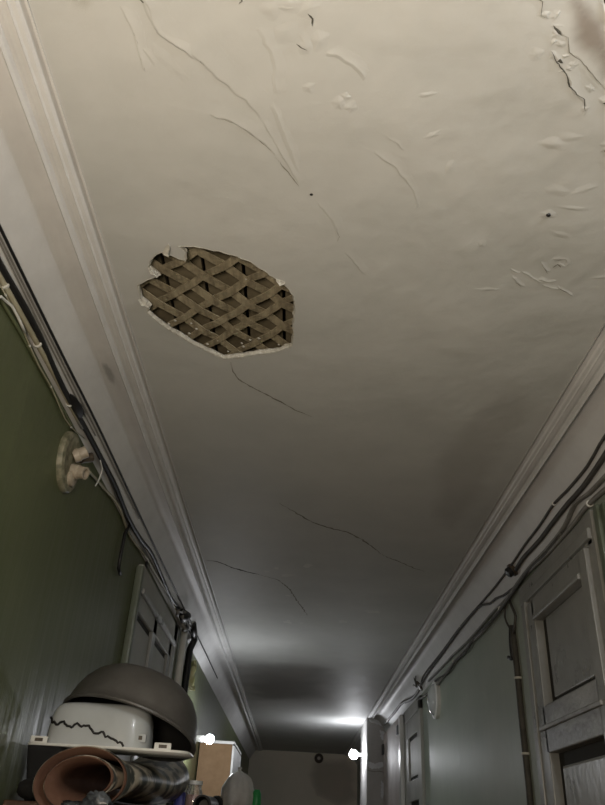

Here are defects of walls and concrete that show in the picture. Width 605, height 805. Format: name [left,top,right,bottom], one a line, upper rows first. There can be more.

flaking render [137,244,296,360]
crack [231,365,305,414]